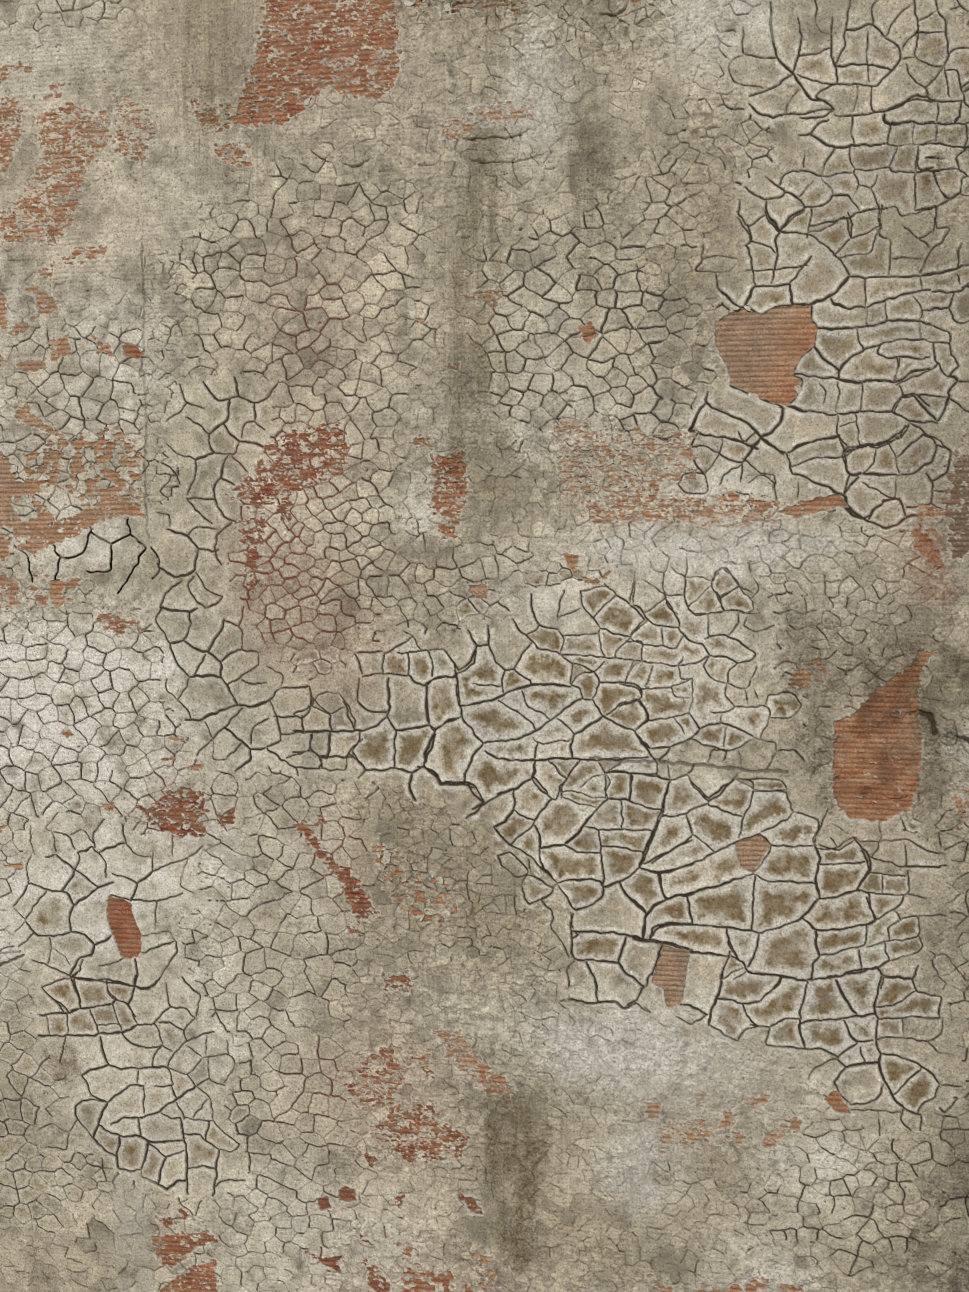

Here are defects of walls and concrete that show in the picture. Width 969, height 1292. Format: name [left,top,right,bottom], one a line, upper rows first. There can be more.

peeling [187,0,534,168]
peeling [0,60,158,336]
crack [27,242,205,538]
crack [469,0,969,533]
peeling [714,305,818,409]
crack [8,562,50,598]
peeling [0,404,146,609]
peeling [226,422,349,593]
crack [156,162,969,1292]
peeling [832,649,937,822]
peeling [106,895,142,959]
crack [0,580,408,1264]